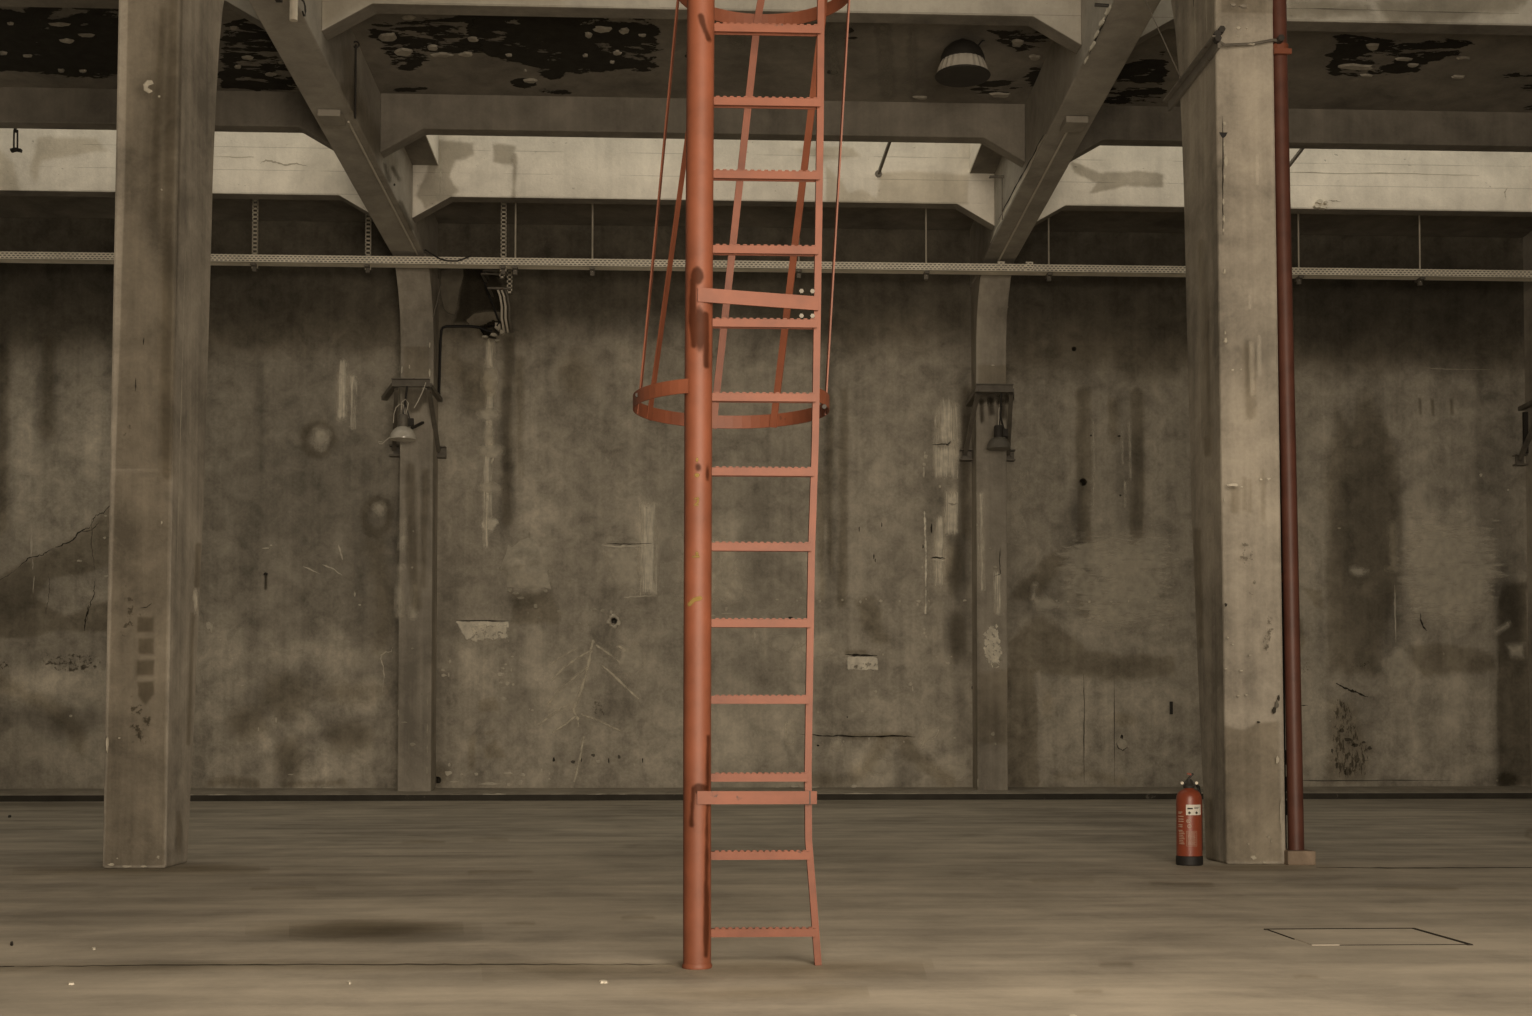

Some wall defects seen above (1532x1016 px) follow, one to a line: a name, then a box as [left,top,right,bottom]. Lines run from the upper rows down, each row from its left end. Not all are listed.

peeling [0,7,119,79]
peeling [368,15,661,95]
peeling [1324,34,1473,79]
crack [0,506,109,631]